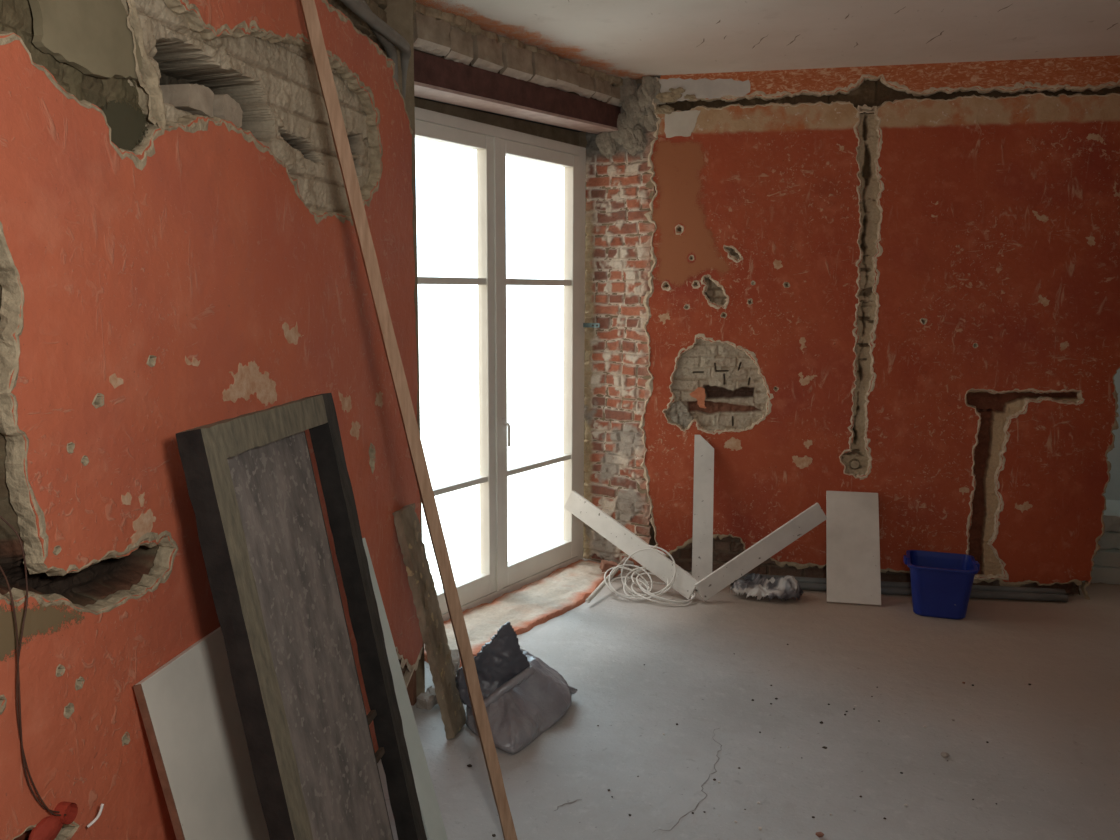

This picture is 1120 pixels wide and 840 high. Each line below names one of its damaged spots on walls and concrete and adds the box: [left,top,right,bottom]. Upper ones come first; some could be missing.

spalling [0,0,383,226]
flaking render [321,0,413,134]
flaking render [413,0,1120,595]
spalling [0,221,179,615]
crack [659,728,722,831]